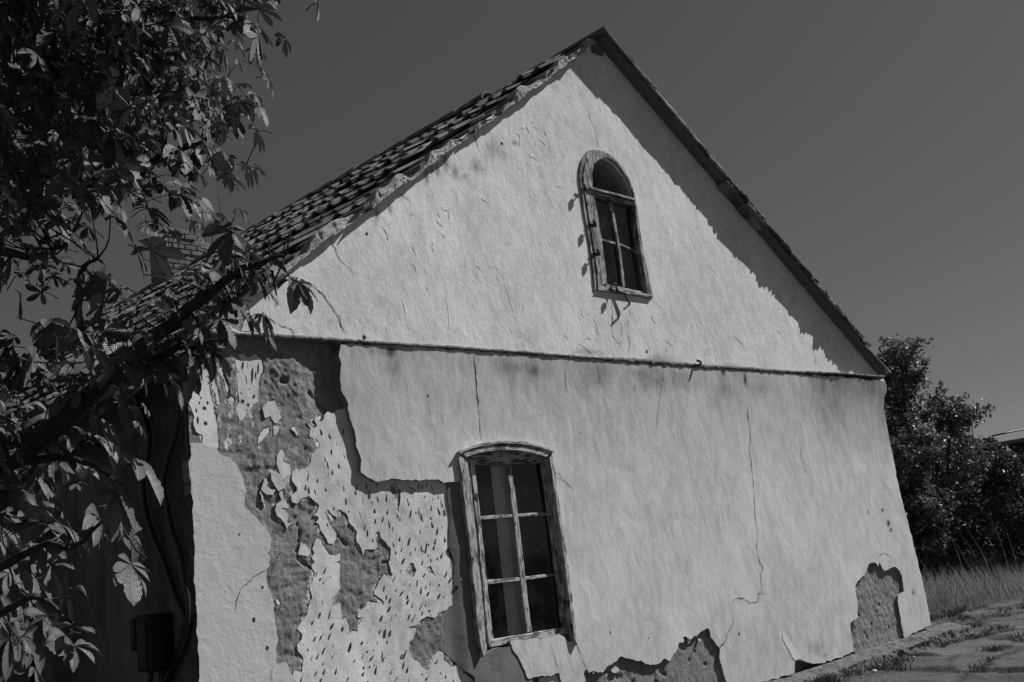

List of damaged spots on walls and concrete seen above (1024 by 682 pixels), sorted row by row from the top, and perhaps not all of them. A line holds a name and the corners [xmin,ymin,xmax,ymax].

flaking render [182,336,560,682]
flaking render [850,563,902,654]
flaking render [584,629,724,682]